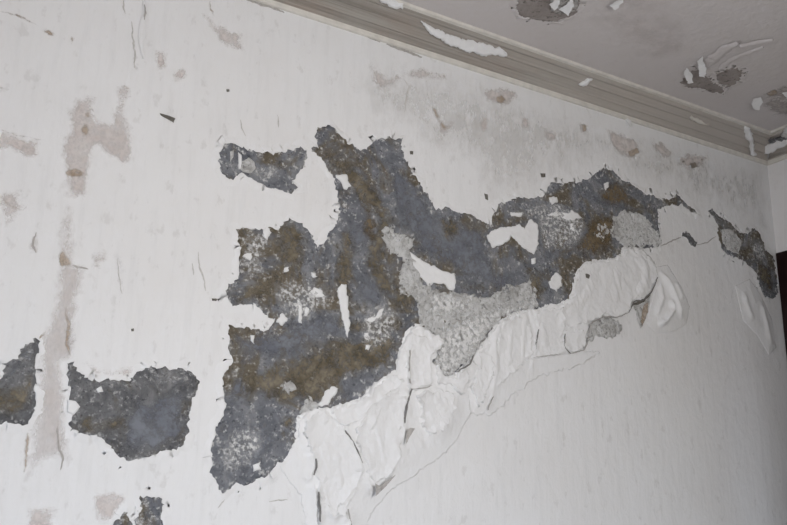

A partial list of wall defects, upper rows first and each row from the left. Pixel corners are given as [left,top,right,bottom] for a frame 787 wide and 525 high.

peeling [420,21,507,57]
flaking render [509,0,586,25]
flaking render [675,39,773,97]
flaking render [56,117,780,525]
flaking render [0,328,47,434]